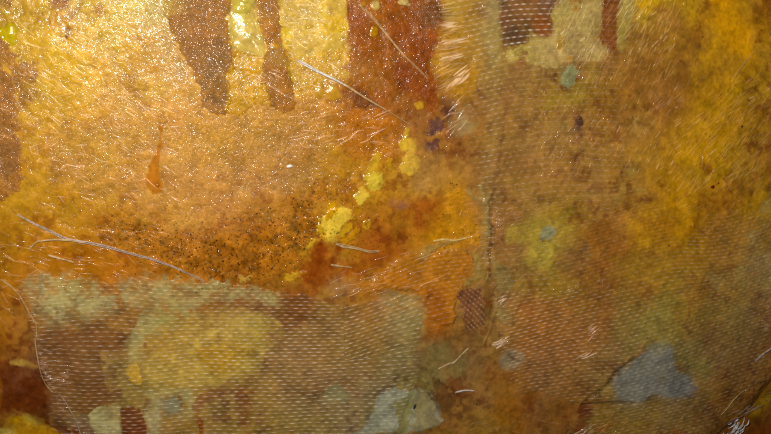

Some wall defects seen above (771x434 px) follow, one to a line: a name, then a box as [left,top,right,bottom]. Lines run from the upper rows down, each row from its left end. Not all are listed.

rust [323,0,442,175]
water stain [503,214,595,279]
water stain [559,149,593,183]
water stain [599,0,771,248]